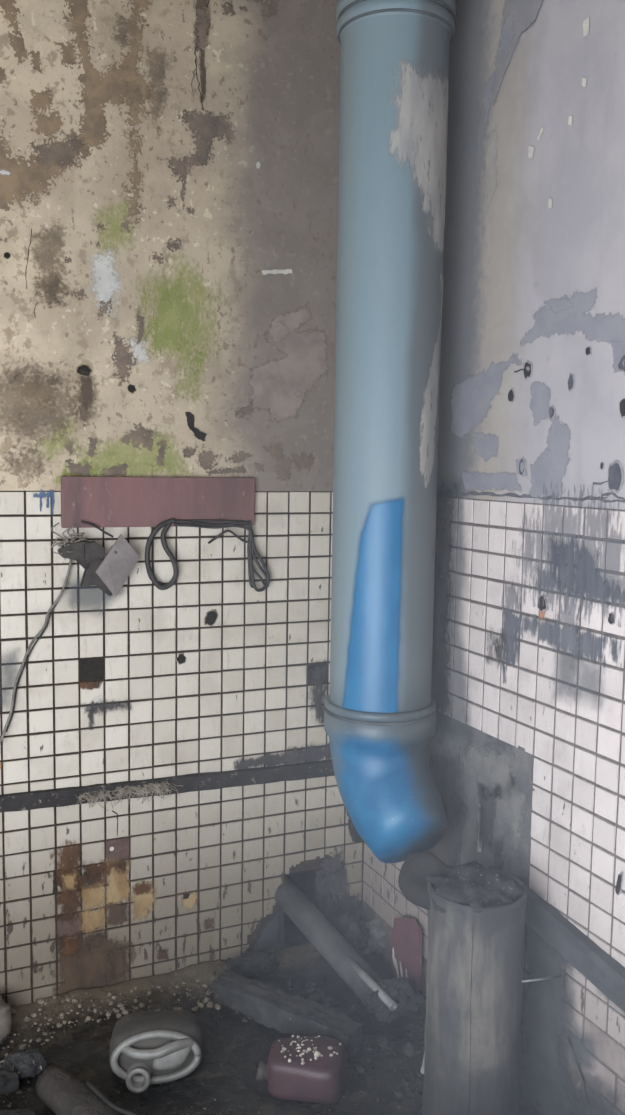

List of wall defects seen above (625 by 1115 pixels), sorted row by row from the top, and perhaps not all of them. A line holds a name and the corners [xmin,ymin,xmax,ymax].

crack [191,0,210,110]
damp [0,366,97,477]
peeling [450,288,625,499]
damp [535,535,625,607]
peeling [78,658,104,703]
damp [487,610,621,667]
corrosion [51,841,155,933]